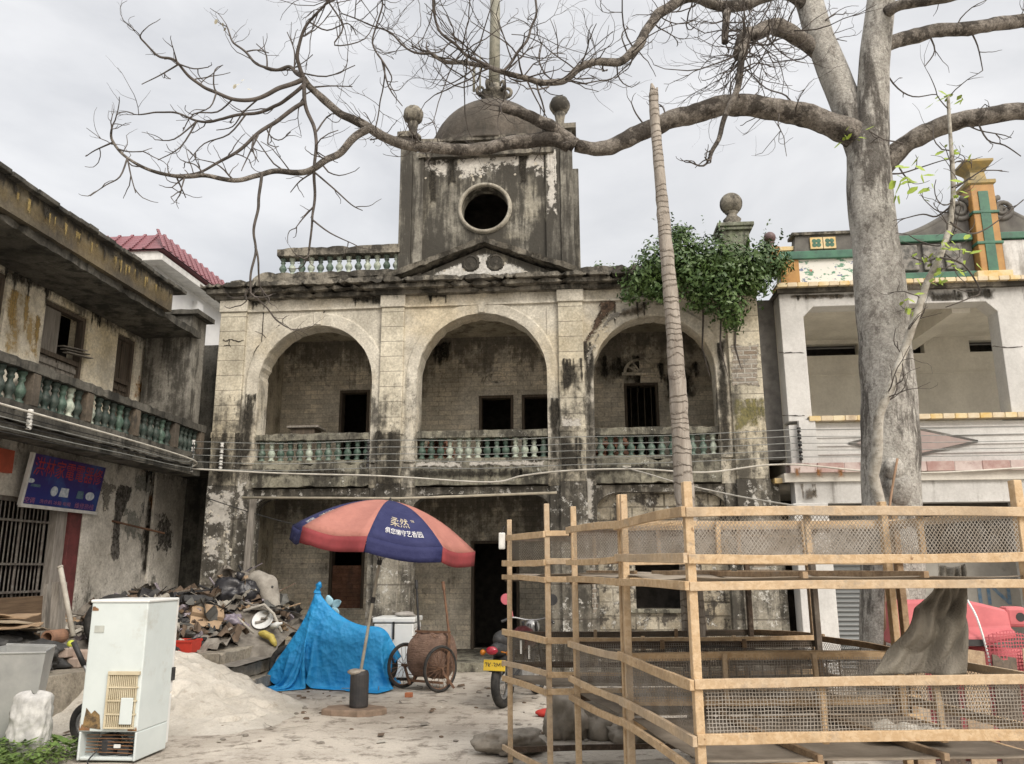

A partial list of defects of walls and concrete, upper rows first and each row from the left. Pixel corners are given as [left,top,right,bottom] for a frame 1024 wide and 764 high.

peeling [425,149,557,214]
water stain [5,268,49,355]
water stain [375,342,673,490]
water stain [685,363,698,397]
water stain [142,471,153,572]